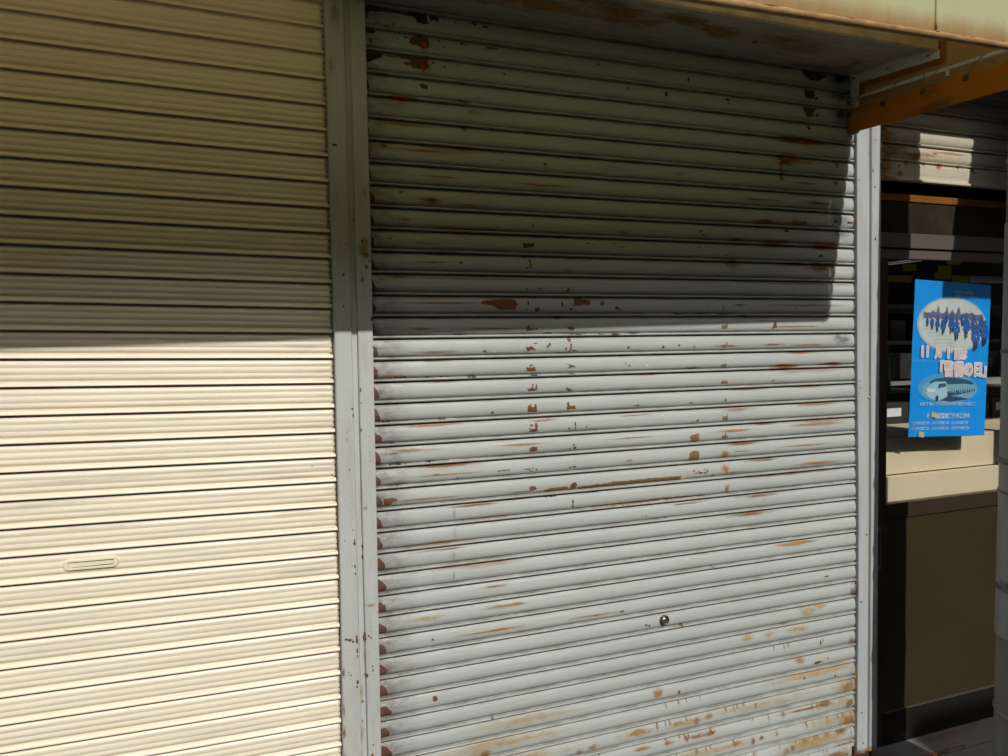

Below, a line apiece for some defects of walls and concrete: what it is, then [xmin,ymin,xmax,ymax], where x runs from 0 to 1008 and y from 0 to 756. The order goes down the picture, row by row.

rust [872,128,962,188]
rust [633,715,715,752]
rust [782,674,872,756]